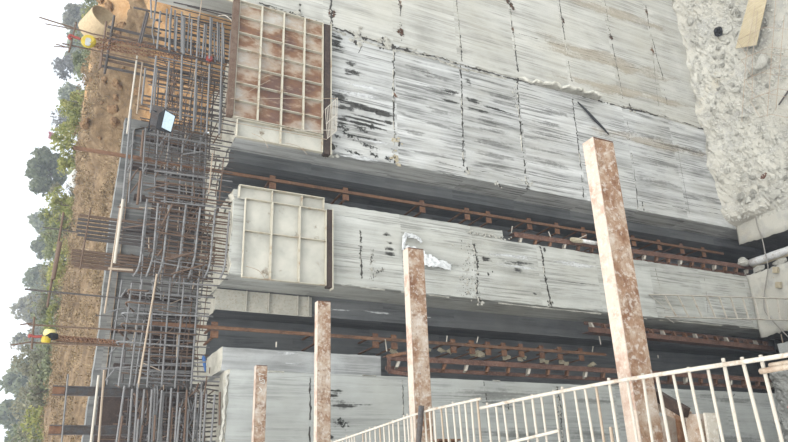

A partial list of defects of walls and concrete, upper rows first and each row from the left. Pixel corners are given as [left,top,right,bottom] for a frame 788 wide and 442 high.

crack [259,0,703,209]
spalling [518,77,603,98]
crack [539,246,591,306]